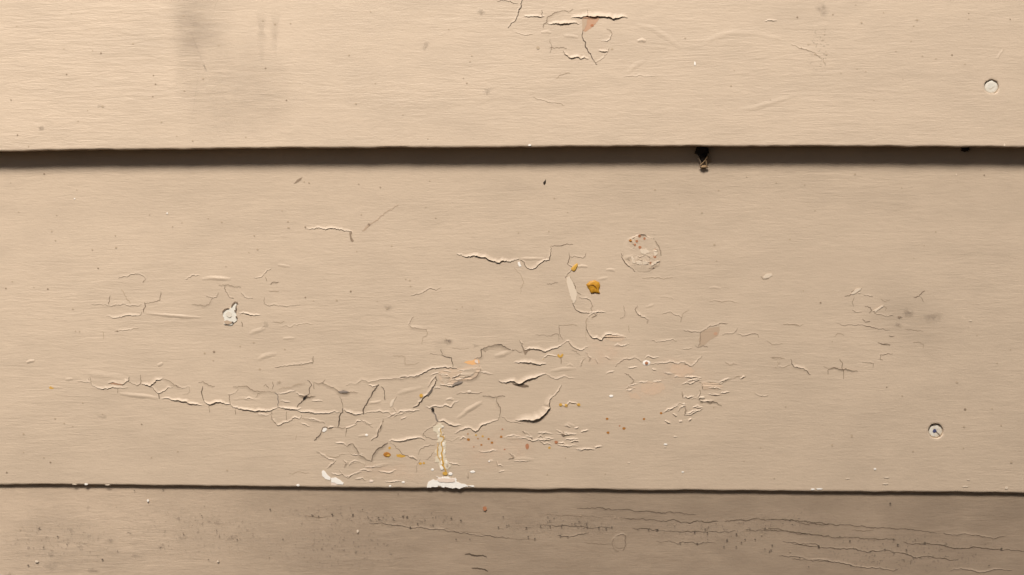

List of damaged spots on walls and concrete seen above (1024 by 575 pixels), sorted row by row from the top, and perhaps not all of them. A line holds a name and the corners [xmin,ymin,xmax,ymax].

peeling [583,16,600,32]
crack [305,225,354,242]
peeling [438,359,481,393]
crack [78,244,924,483]
peeling [427,425,475,489]
peeling [322,470,344,485]